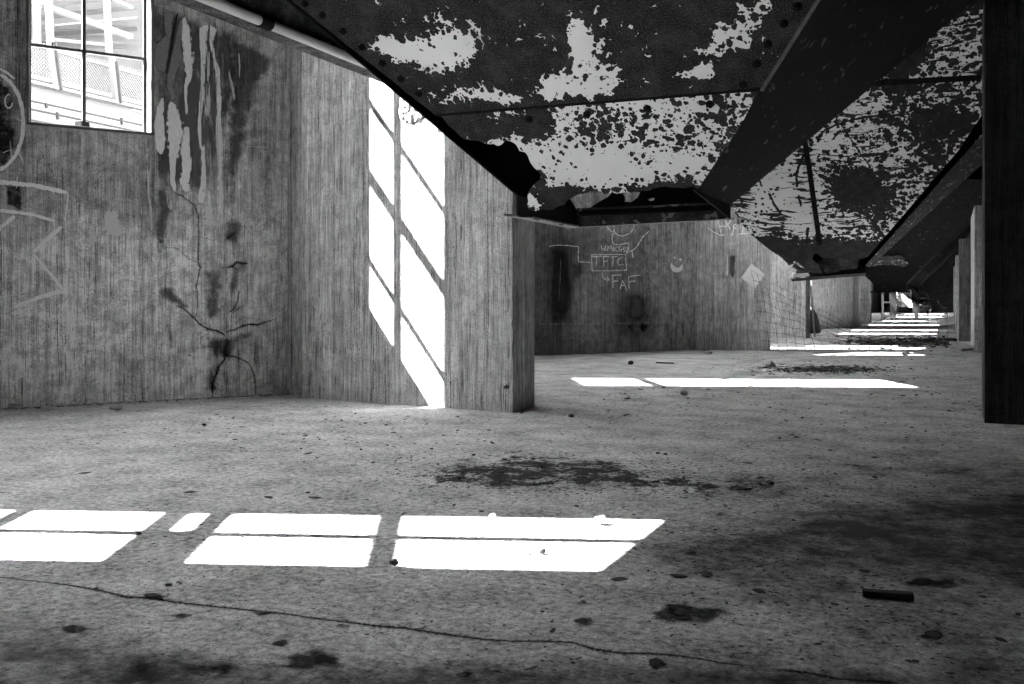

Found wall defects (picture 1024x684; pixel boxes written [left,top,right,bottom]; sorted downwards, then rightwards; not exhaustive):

spalling [154,8,183,101]
water stain [145,9,270,253]
spalling [398,98,423,124]
crack [134,67,292,394]
crack [0,577,749,666]